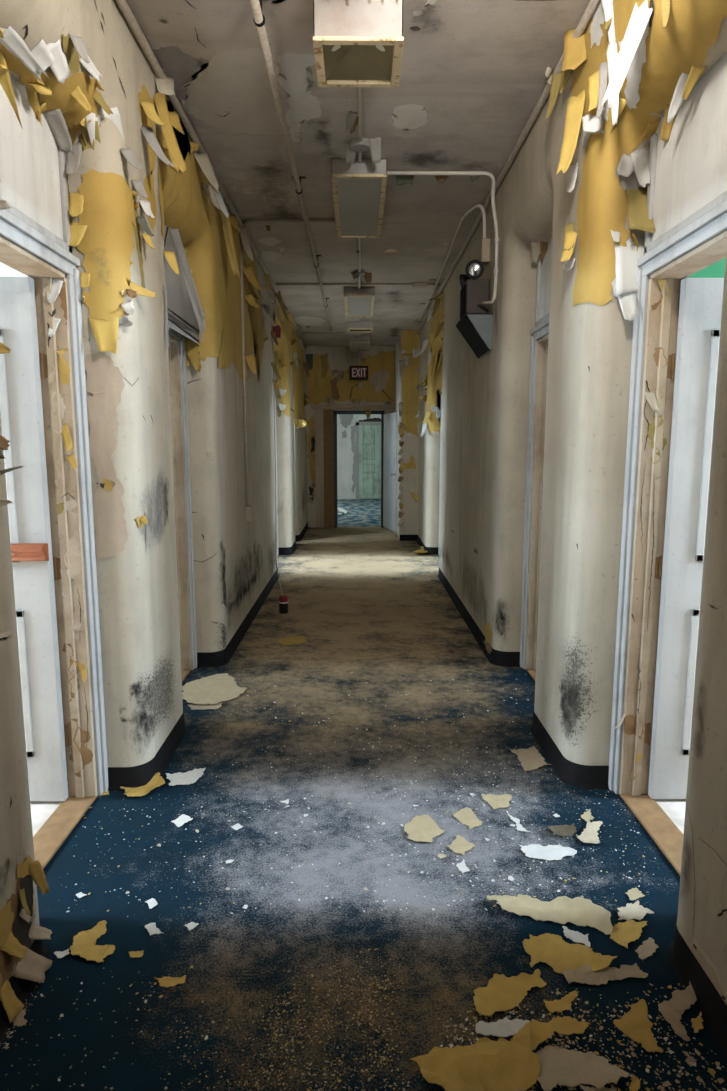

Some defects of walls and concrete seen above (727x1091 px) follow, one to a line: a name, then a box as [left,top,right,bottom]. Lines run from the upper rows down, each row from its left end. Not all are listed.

peeling [544,0,727,321]
peeling [0,0,445,560]
peeling [46,278,93,777]
peeling [640,381,667,628]
leakage [120,655,176,740]
peeling [182,673,247,710]
leakage [559,637,596,746]
peeling [101,772,165,797]
spalling [0,855,115,1024]
peeling [145,922,162,936]
peeling [154,975,186,988]
crack [686,801,727,936]